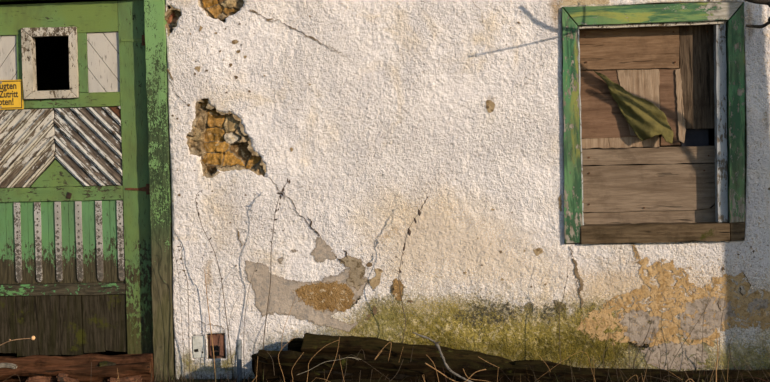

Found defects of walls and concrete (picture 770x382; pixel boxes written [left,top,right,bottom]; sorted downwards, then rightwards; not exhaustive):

spalling [165,5,182,36]
spalling [200,0,244,34]
crack [250,10,351,63]
spalling [186,98,266,178]
crack [266,176,321,238]
peeling [235,237,383,332]
peeling [392,278,413,303]
water stain [359,295,472,350]
water stain [448,294,623,368]
crack [570,248,584,308]
peeling [577,245,770,371]